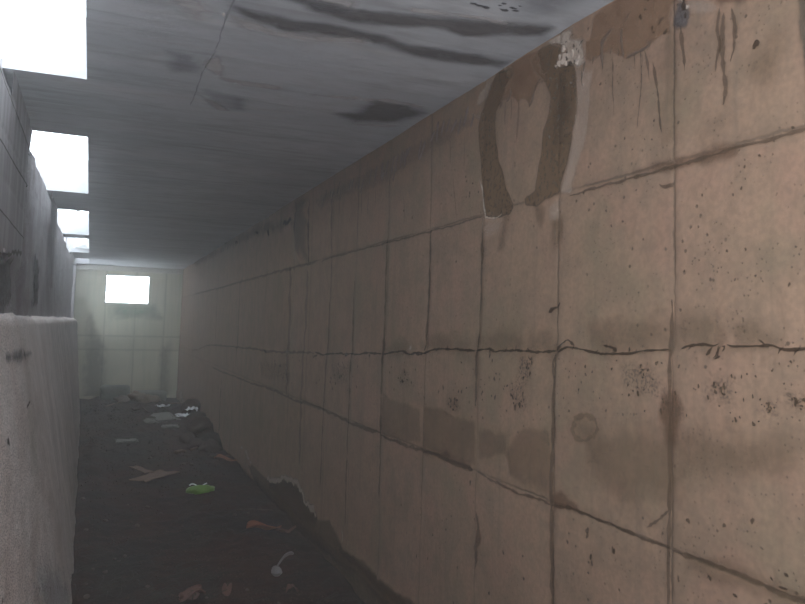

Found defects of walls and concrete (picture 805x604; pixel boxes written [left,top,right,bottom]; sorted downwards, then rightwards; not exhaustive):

damp [715,8,737,105]
damp [237,0,674,225]
crack [573,128,805,195]
crack [193,339,805,359]
crack [212,366,805,603]